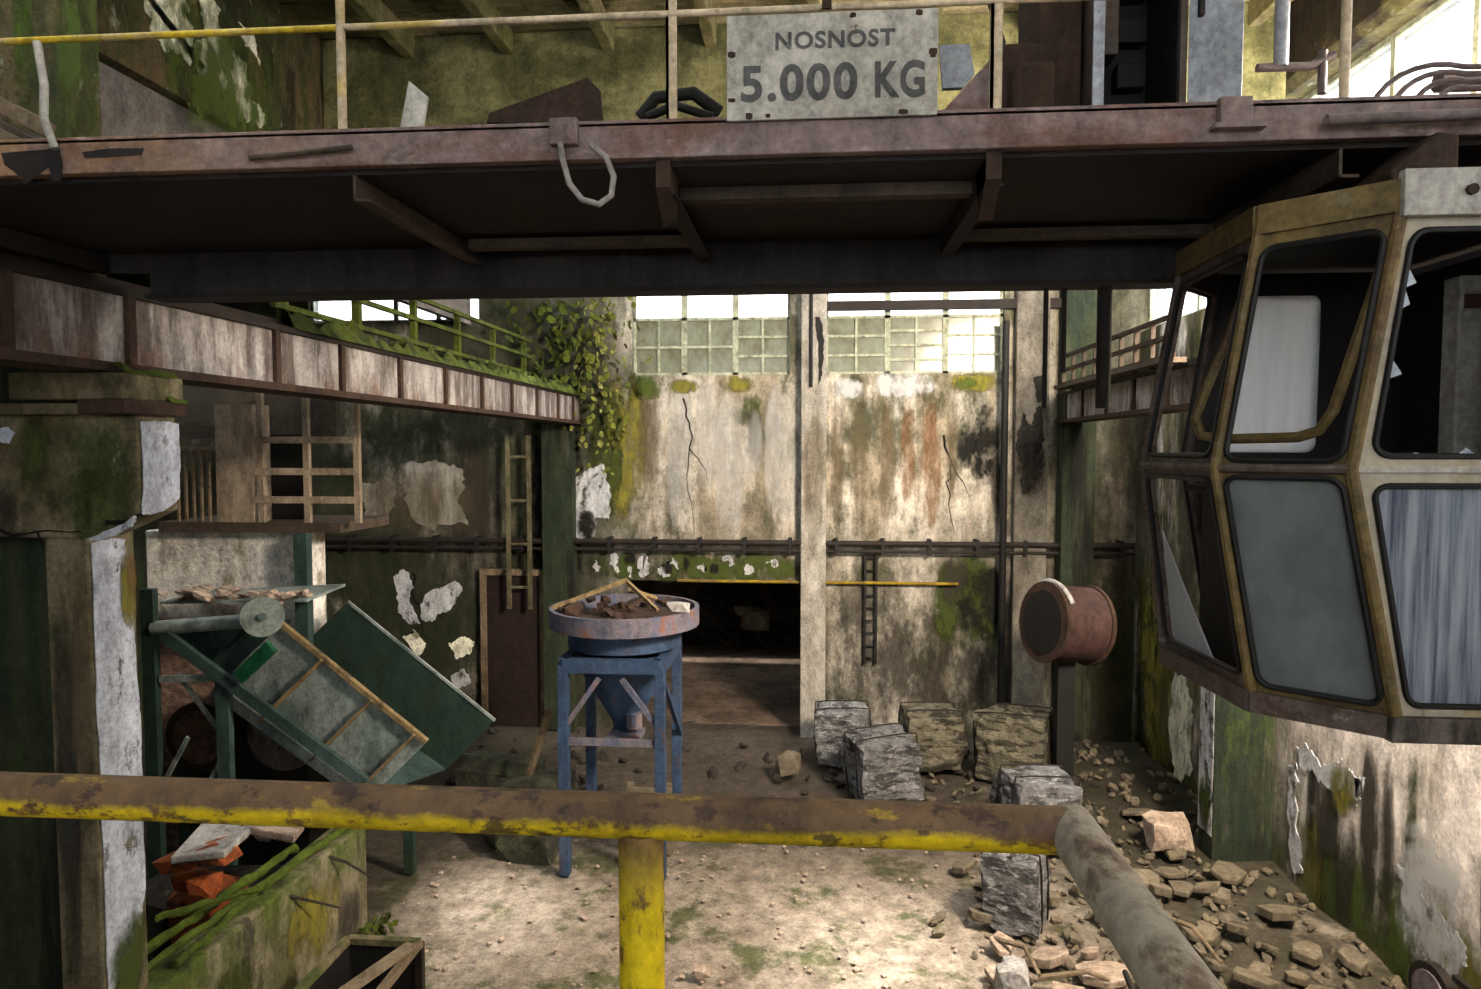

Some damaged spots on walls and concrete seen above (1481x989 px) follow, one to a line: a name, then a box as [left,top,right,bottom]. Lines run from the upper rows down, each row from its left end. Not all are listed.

leakage [12,0,33,85]
leakage [56,0,82,106]
peeling [143,0,272,133]
leakage [836,373,933,398]
peeling [362,459,468,531]
mould [957,405,1001,510]
peeling [88,421,181,776]
peeling [393,569,475,689]
mould [933,556,1011,645]
peeling [101,820,146,989]
leakage [1301,749,1481,989]